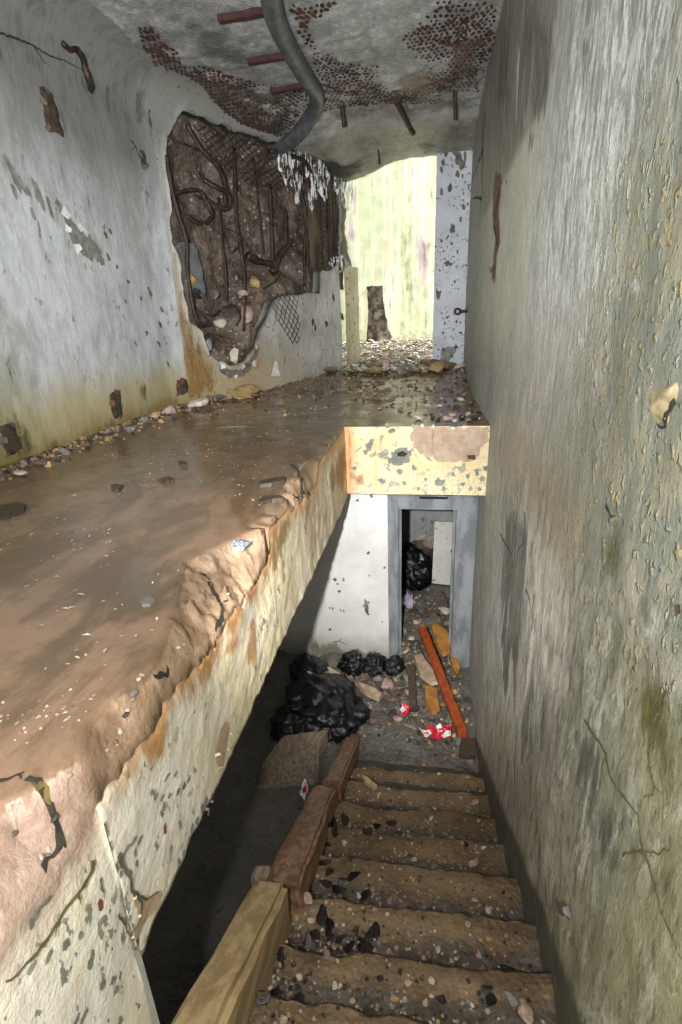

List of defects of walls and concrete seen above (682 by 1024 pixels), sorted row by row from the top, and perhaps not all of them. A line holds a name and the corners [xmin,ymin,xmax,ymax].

corrosion [217,7,264,25]
spalling [39,86,65,138]
corrosion [152,46,303,134]
spalling [163,116,353,379]
corrosion [490,173,507,282]
corrosion [181,313,213,398]
flaking render [385,423,490,491]
crack [201,573,225,631]
crack [0,771,67,874]
crack [584,690,681,959]